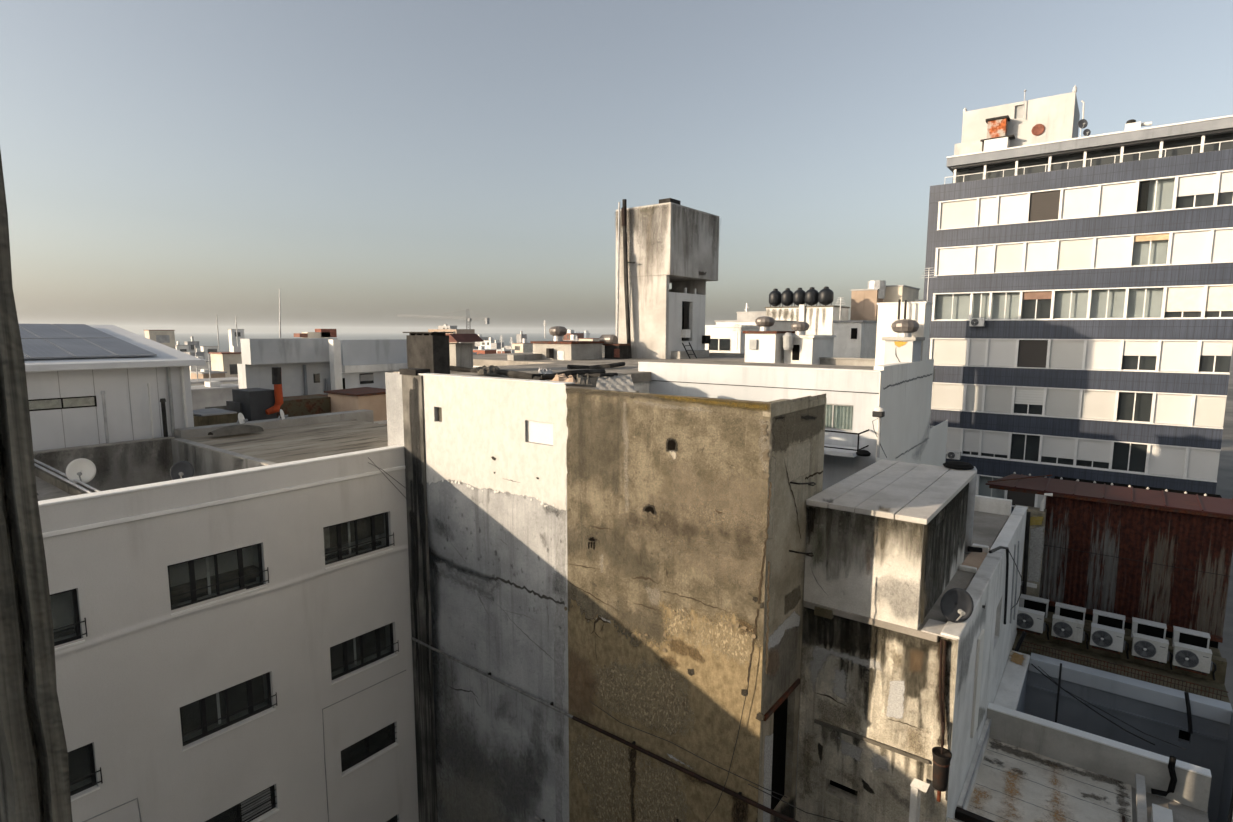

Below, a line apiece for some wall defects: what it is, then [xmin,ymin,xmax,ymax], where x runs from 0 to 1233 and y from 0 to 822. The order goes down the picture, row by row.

water stain [403,378,497,764]
crack [479,459,823,682]
peeling [564,599,764,822]
water stain [567,399,776,647]
water stain [822,726,931,781]
water stain [802,483,969,727]